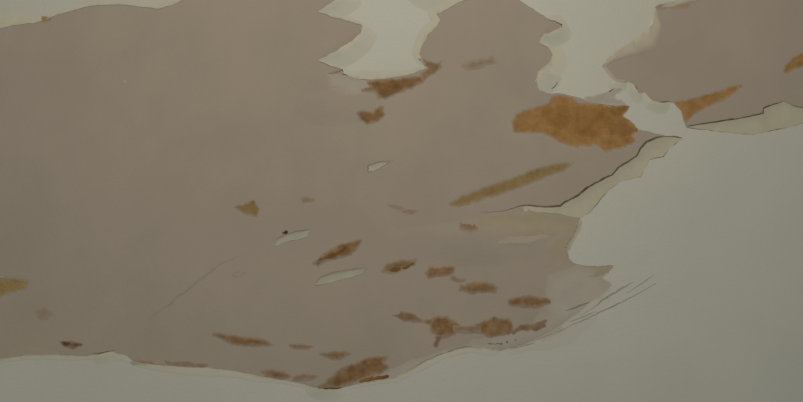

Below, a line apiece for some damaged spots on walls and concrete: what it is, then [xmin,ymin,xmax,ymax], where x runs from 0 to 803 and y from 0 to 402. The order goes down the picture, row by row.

peeling [510,0,803,153]
peeling [0,0,665,388]
crack [498,276,656,351]
peeling [305,386,345,401]